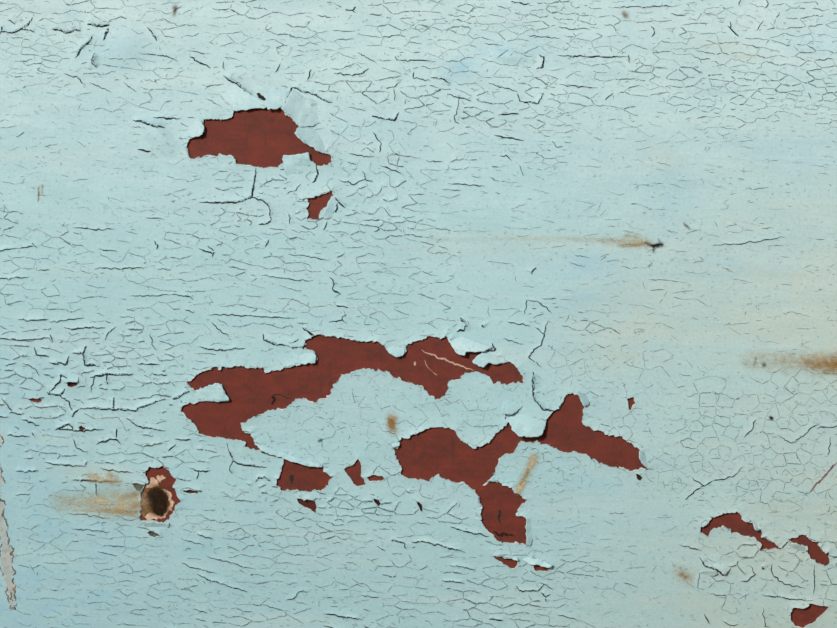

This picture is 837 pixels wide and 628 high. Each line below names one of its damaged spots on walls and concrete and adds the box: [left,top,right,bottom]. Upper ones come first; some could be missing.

crack [0,106,61,196]
peeling [186,85,332,176]
crack [428,142,486,214]
crack [570,192,644,267]
crack [667,218,793,275]
rust [784,355,837,371]
peeling [180,333,524,513]
crack [292,371,507,468]
rust [67,475,175,521]
peeling [387,392,650,547]
peeling [700,512,830,566]
peeling [790,603,830,628]